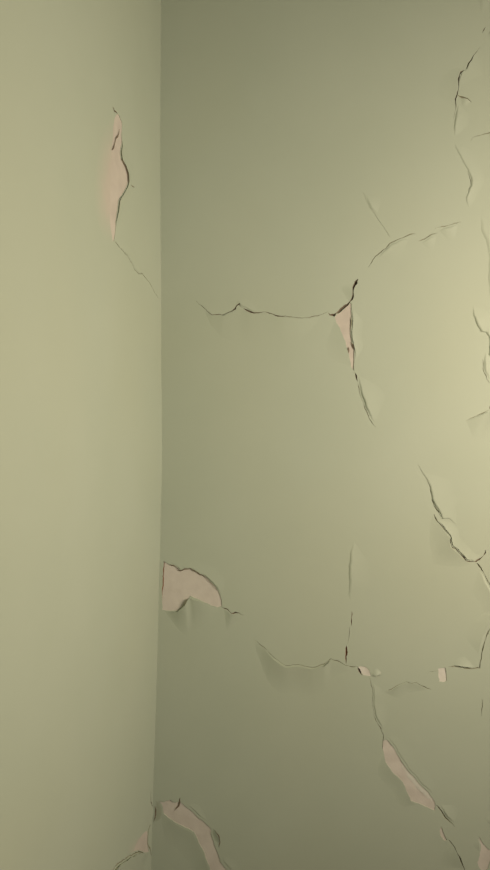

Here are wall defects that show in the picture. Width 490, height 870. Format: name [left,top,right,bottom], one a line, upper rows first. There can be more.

crack [438,28,490,140]
peeling [94,108,134,245]
crack [329,279,358,317]
peeling [473,305,490,383]
crack [355,373,385,425]
spalling [162,559,225,635]
crack [345,542,370,661]
crack [420,469,490,669]
spalling [378,730,435,811]
crack [113,851,149,870]
crack [154,800,164,821]
crack [438,805,465,870]